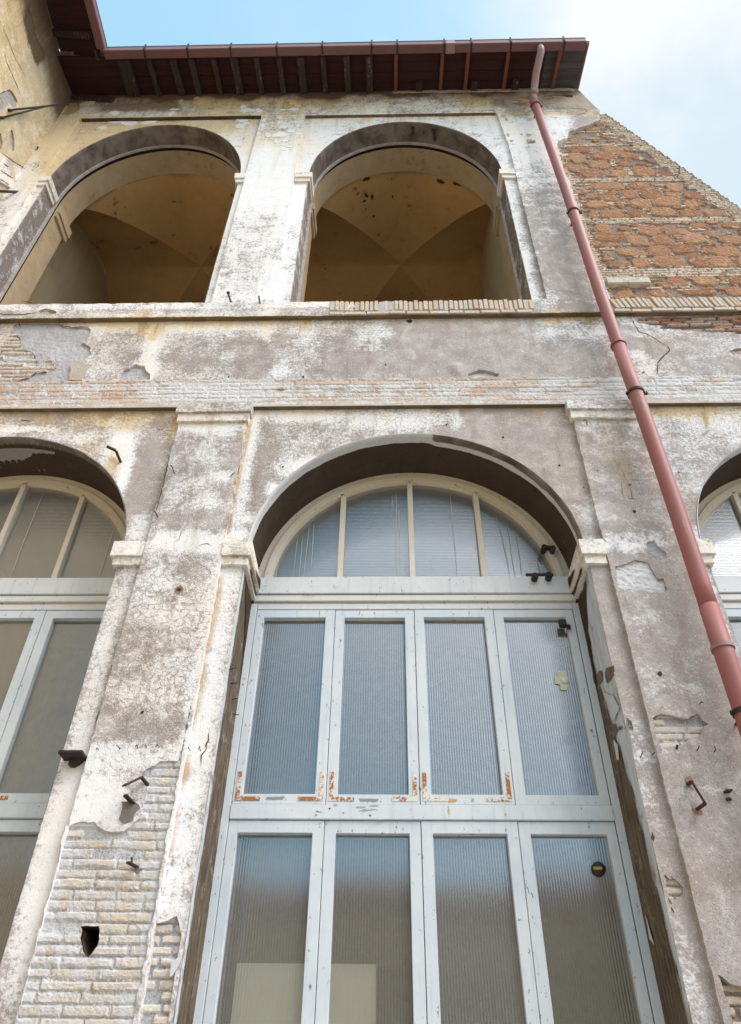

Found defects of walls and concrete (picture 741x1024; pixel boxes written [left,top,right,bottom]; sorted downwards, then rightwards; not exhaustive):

flaking render [0,311,92,382]
flaking render [122,366,150,380]
crack [633,321,670,374]
flaking render [615,542,666,593]
flaking render [653,715,706,750]
flaking render [14,709,191,1024]
flaking render [720,978,741,1024]